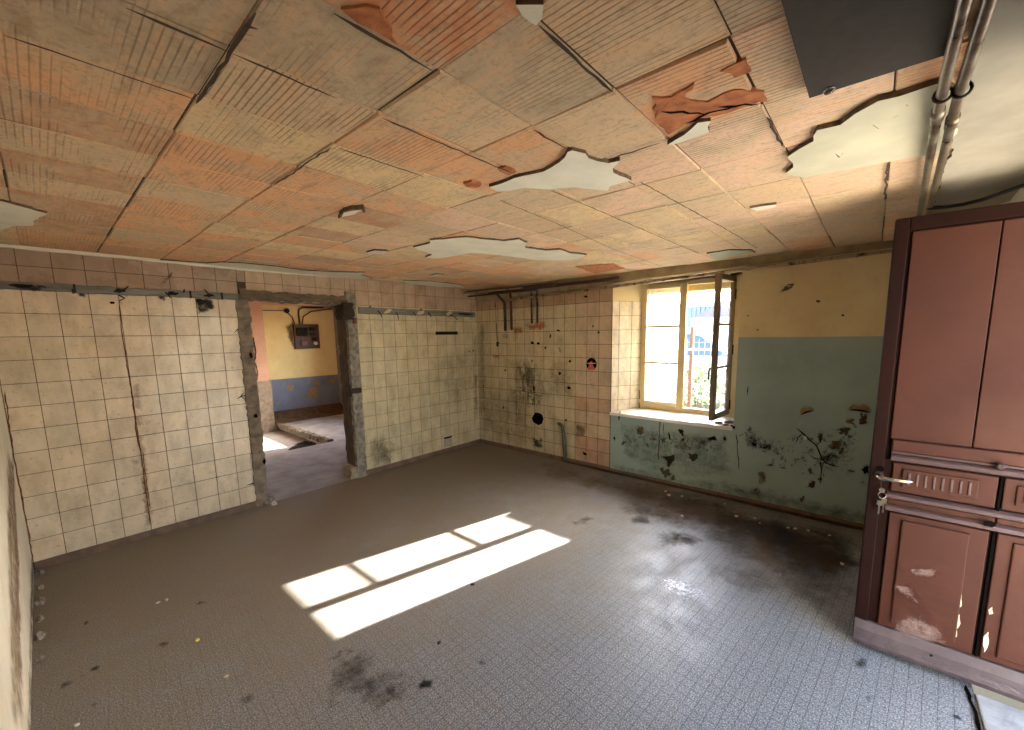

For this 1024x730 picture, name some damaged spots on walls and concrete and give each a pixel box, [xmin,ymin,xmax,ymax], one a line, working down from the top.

spalling [652,56,767,135]
crack [118,295,152,528]
peeling [636,426,698,481]
crack [796,429,838,483]
peeling [799,402,872,502]